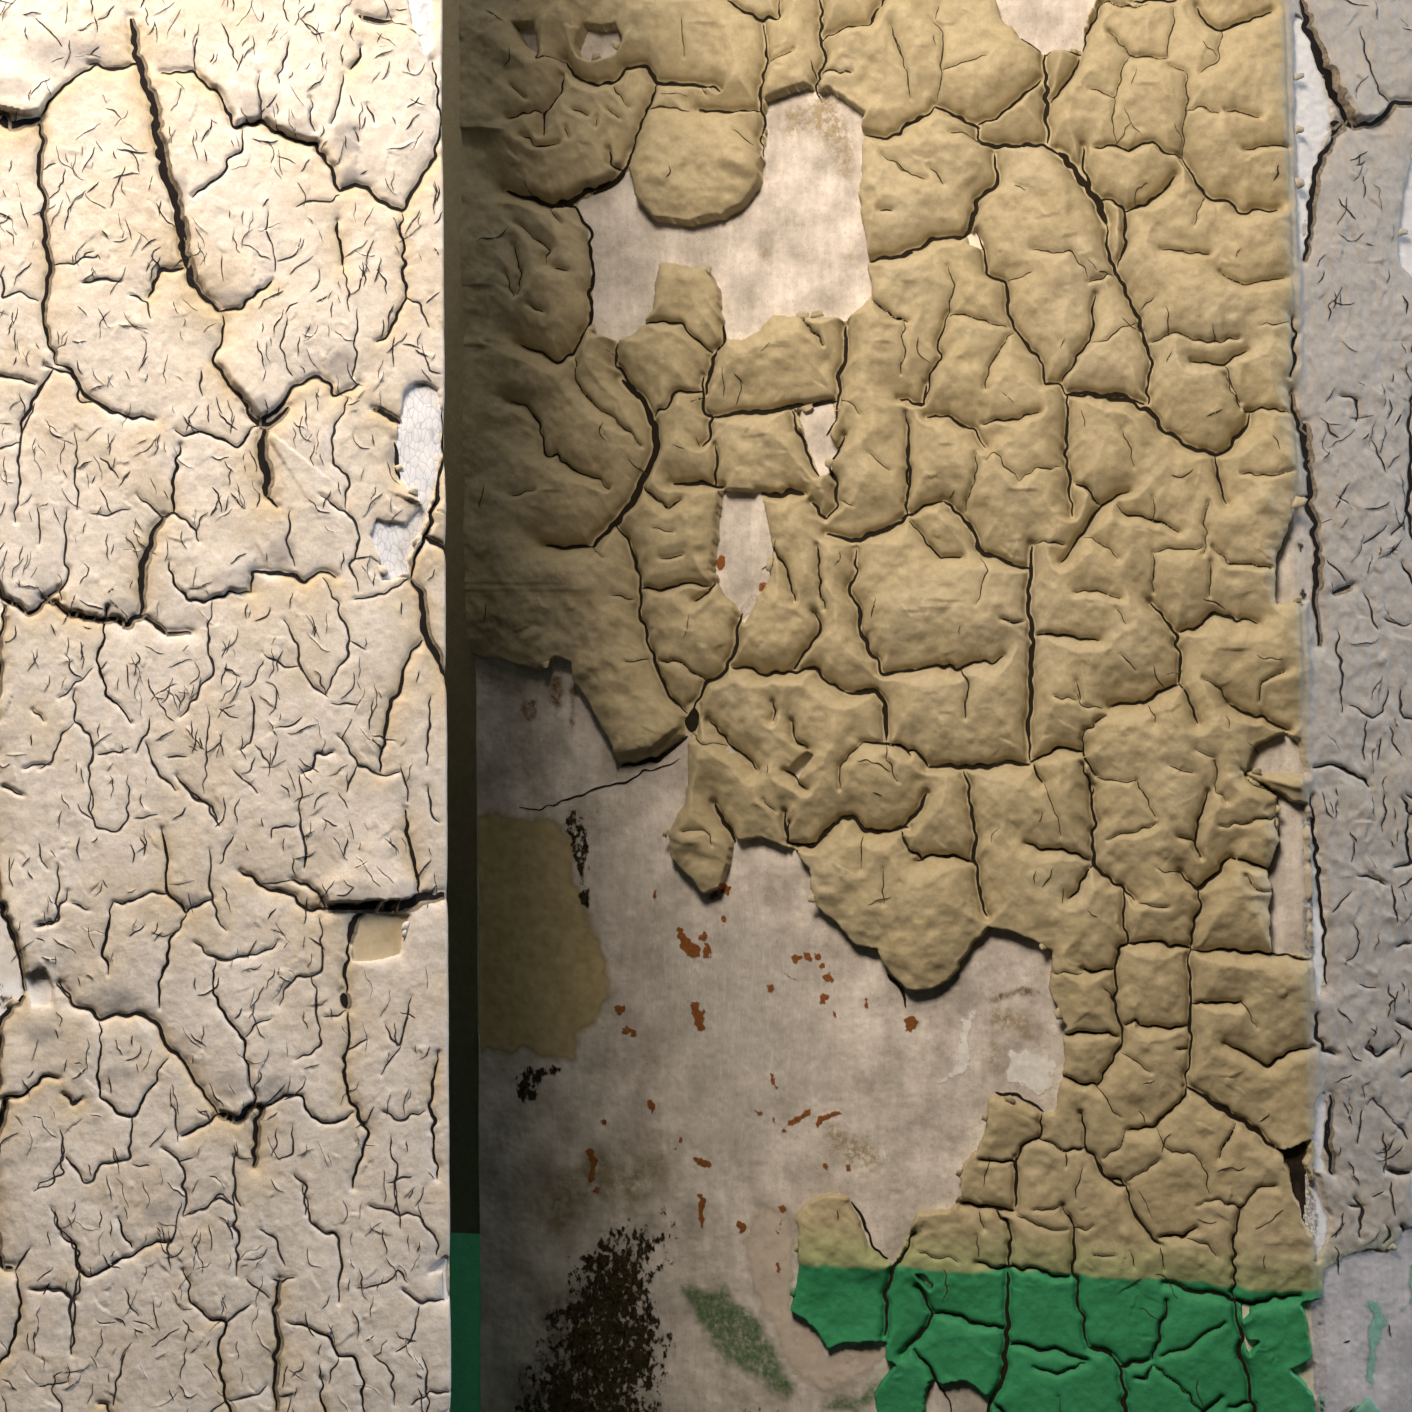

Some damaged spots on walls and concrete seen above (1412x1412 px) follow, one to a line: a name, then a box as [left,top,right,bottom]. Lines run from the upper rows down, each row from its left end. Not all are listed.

peeling [577,89,872,342]
crack [479,0,1412,1412]
peeling [0,916,52,1027]
corrosion [676,927,712,958]
corrosion [690,1001,705,1031]
peeling [475,656,1066,1412]
corrosion [791,952,836,1017]
corrosion [904,1016,918,1032]
corrosion [755,1109,842,1132]
peeling [429,1255,448,1302]
damp [515,1211,677,1412]
peeling [1274,1093,1412,1412]